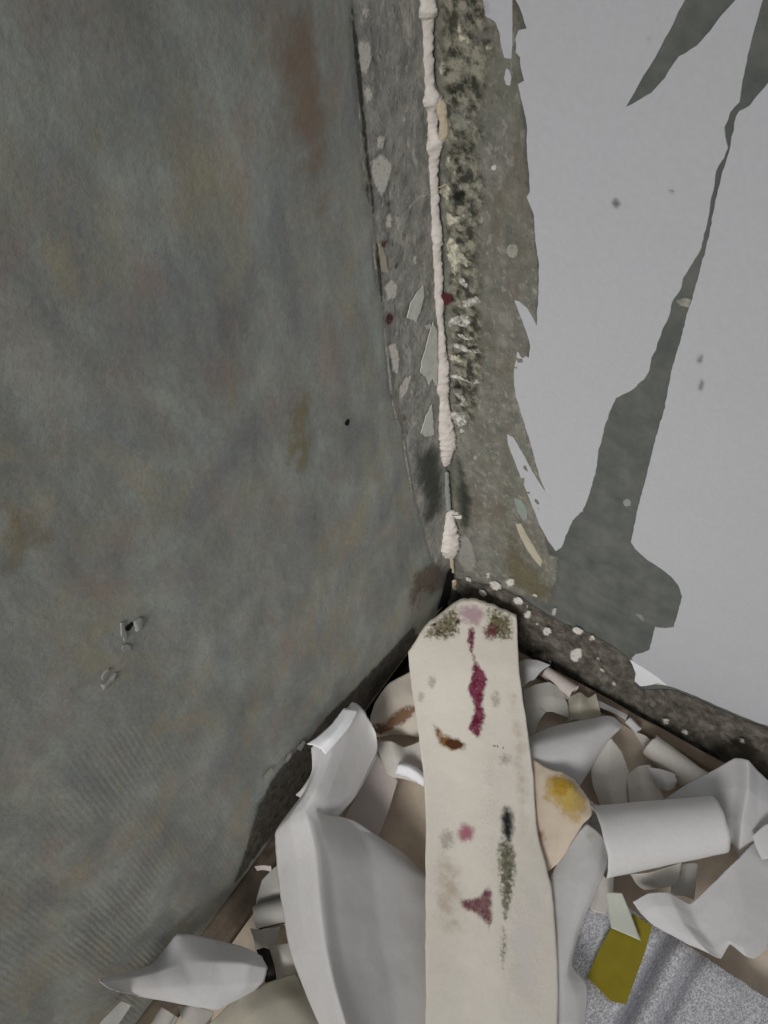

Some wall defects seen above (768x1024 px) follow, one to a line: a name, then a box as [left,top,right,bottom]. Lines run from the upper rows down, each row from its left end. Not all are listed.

flaking render [120,617,146,653]
damp [418,450,441,521]
damp [439,0,489,435]
peeling [351,0,768,780]